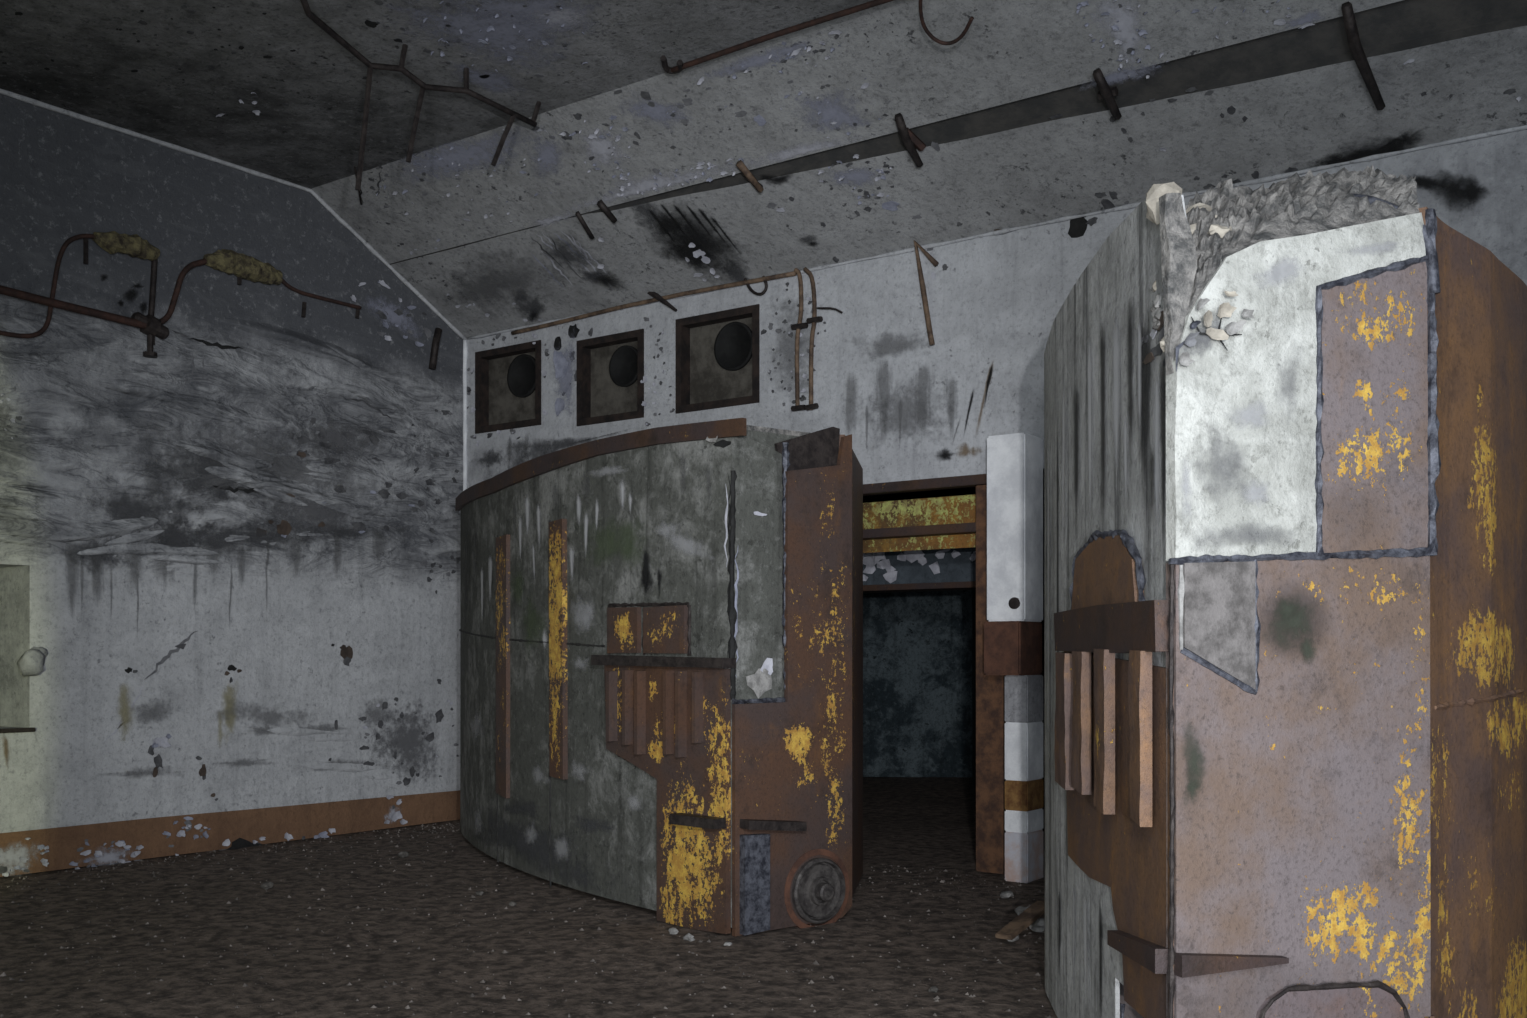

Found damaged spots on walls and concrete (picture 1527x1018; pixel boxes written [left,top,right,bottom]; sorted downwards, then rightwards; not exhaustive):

leakage [649,205,737,249]
spalling [1068,165,1420,375]
leakage [70,540,116,567]
leakage [156,523,361,550]